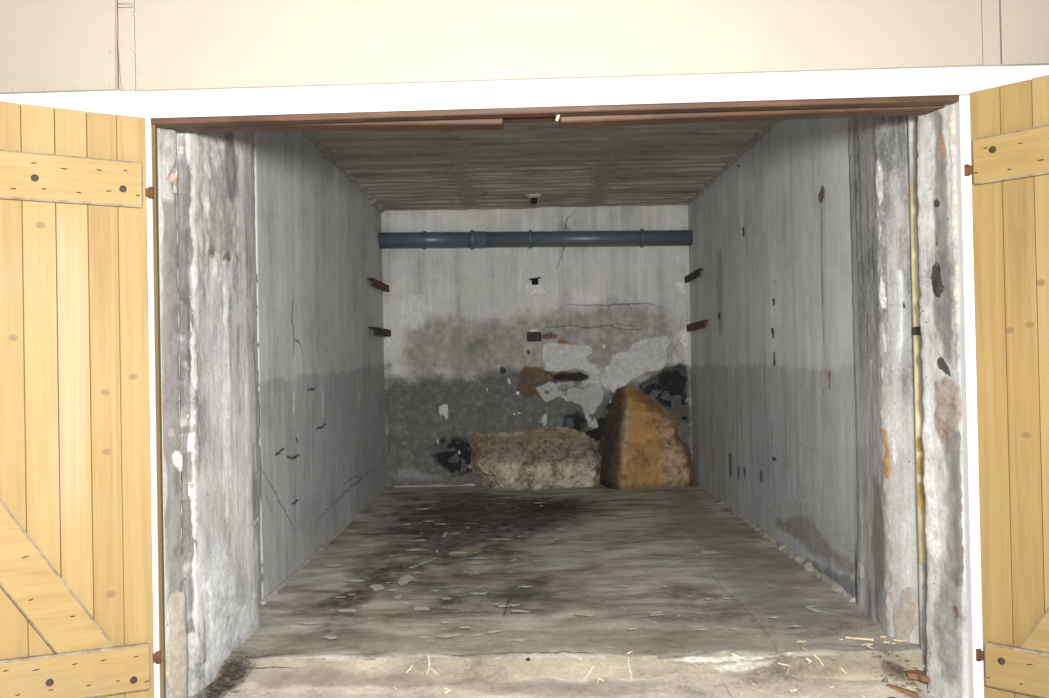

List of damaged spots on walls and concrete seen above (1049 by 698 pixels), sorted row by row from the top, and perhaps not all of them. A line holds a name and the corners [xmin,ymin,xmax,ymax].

damp [225,135,237,198]
peeling [934,182,958,236]
spalling [931,263,960,321]
damp [385,308,693,487]
flaking render [527,336,670,428]
rust [881,430,890,478]
flaking render [889,588,920,642]